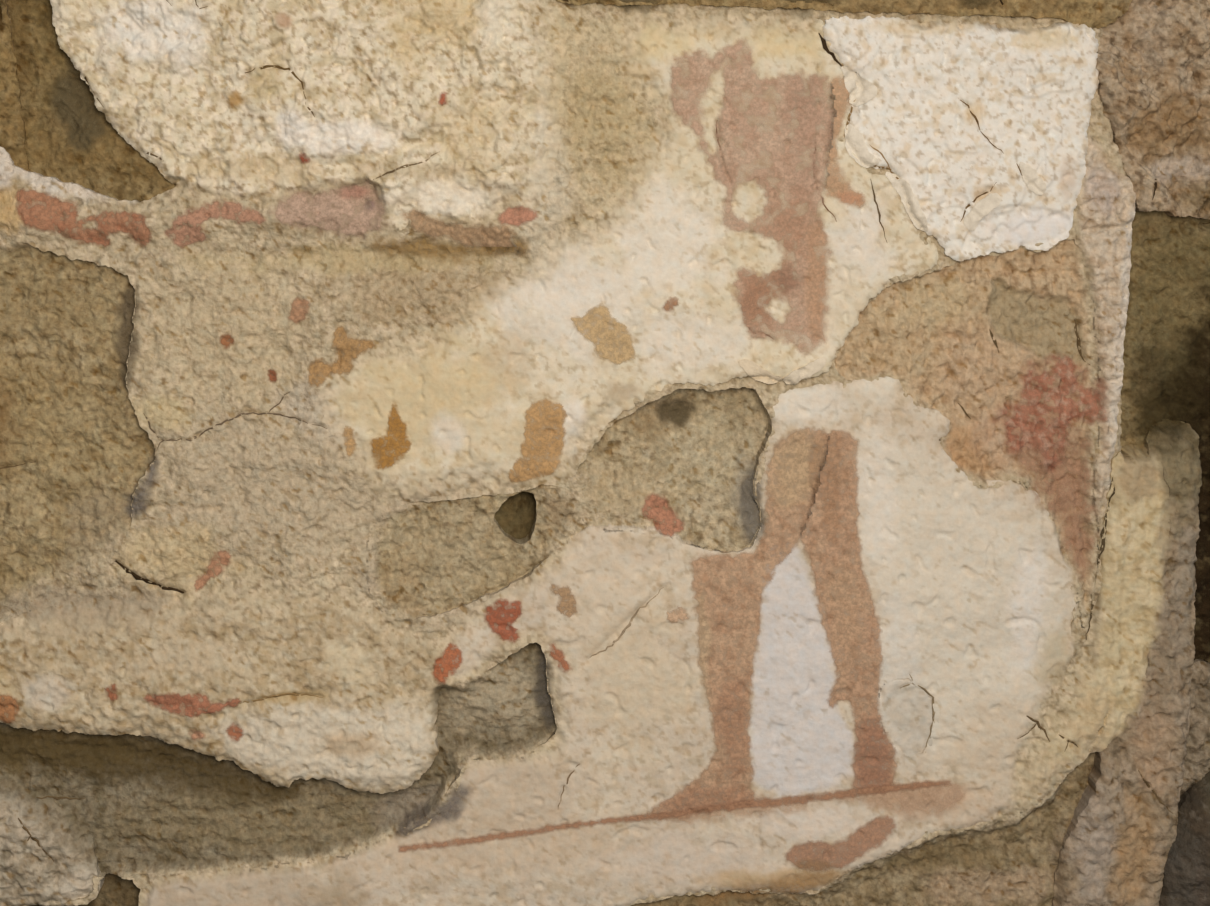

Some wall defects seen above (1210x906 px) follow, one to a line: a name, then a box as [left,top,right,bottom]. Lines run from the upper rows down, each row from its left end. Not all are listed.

flaking render [0,241,156,625]
crack [115,560,184,593]
crack [143,391,327,449]
flaking render [364,16,1104,631]
damp [1140,321,1210,662]
flaking render [0,642,556,906]